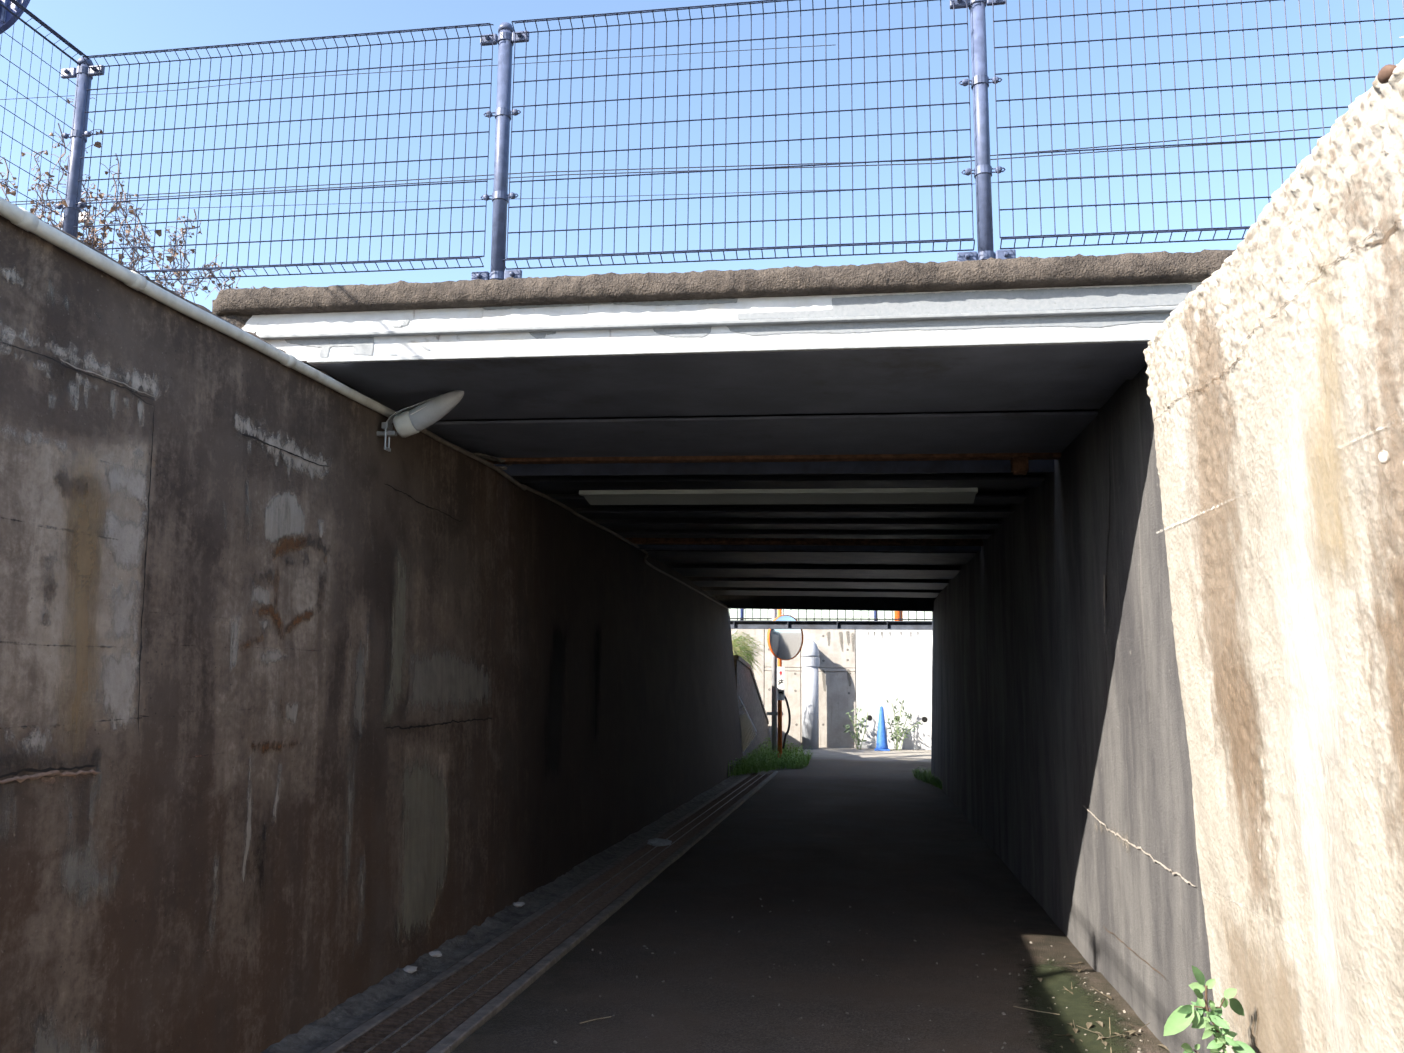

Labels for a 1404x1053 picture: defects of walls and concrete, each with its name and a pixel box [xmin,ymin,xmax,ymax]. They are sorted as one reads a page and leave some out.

peeling [529,331,556,339]
peeling [480,284,1192,337]
crack [1154,223,1396,420]
peeling [235,412,328,478]
leakage [1365,218,1404,820]
corrosion [240,535,330,650]
leakage [1189,319,1271,905]